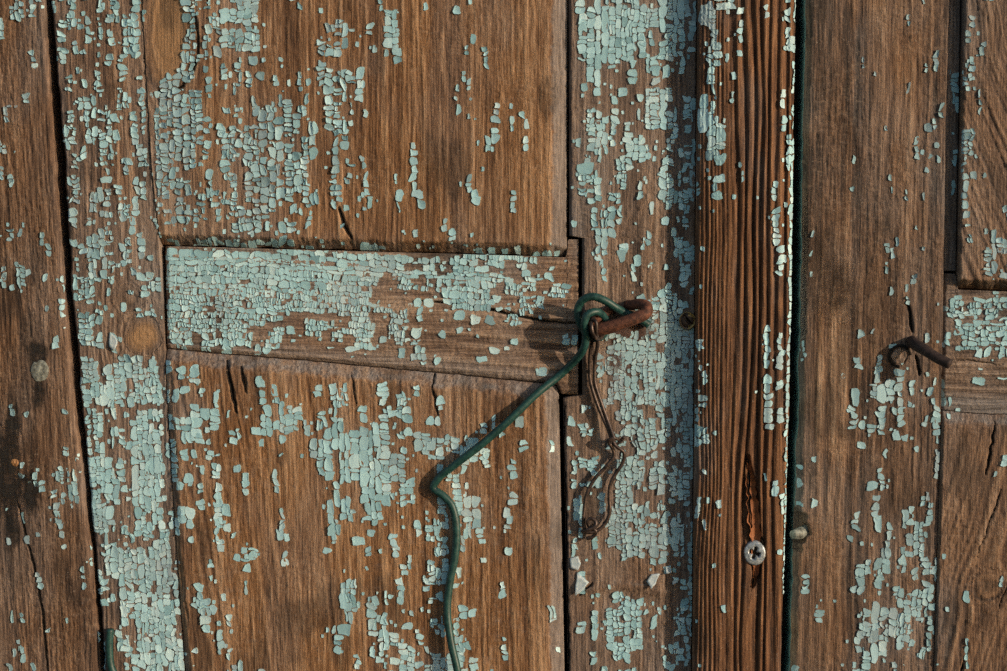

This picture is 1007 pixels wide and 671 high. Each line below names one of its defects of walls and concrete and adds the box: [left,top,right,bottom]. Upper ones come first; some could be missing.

peeling [914,15,987,243]
peeling [562,333,578,345]
peeling [567,0,744,671]
peeling [755,0,818,594]
peeling [884,237,899,274]
peeling [889,274,917,305]
peeling [925,228,1007,385]
peeling [841,344,960,671]
peeling [814,599,836,623]